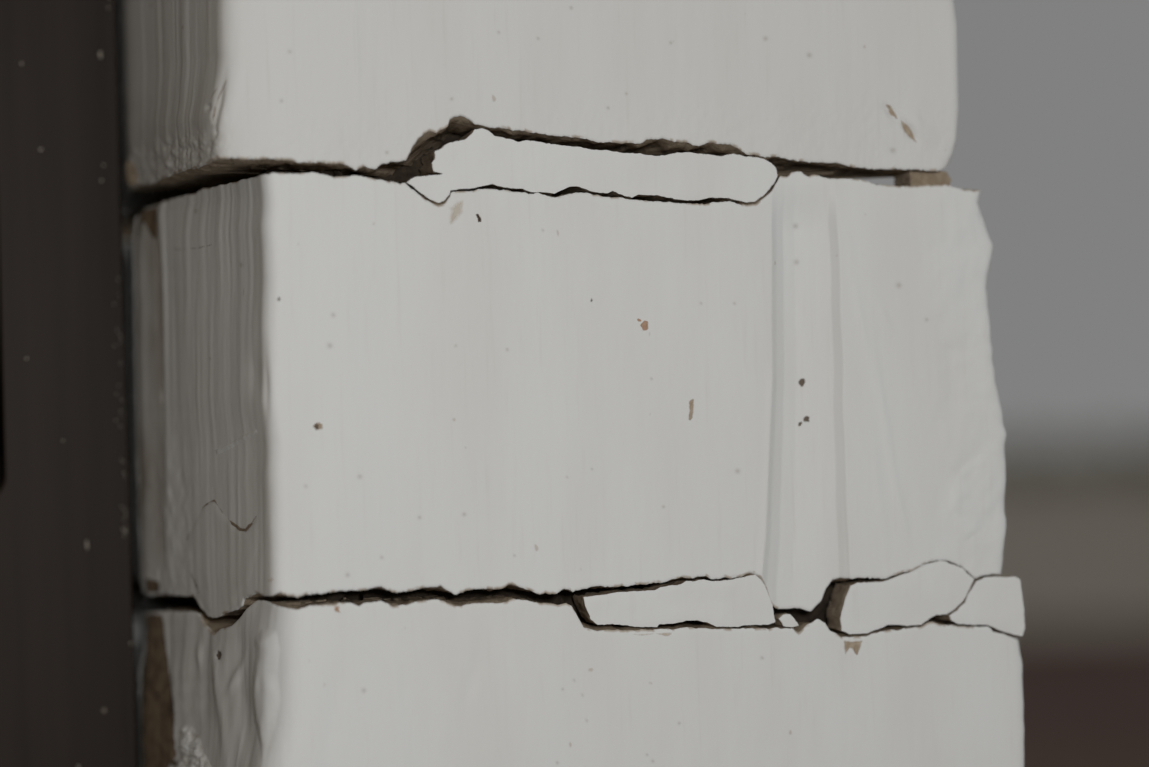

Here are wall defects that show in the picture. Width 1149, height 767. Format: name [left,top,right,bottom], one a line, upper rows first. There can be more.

crack [262,133,464,184]
crack [281,578,704,625]
crack [773,578,869,630]
crack [929,618,970,626]
peeling [141,614,212,767]